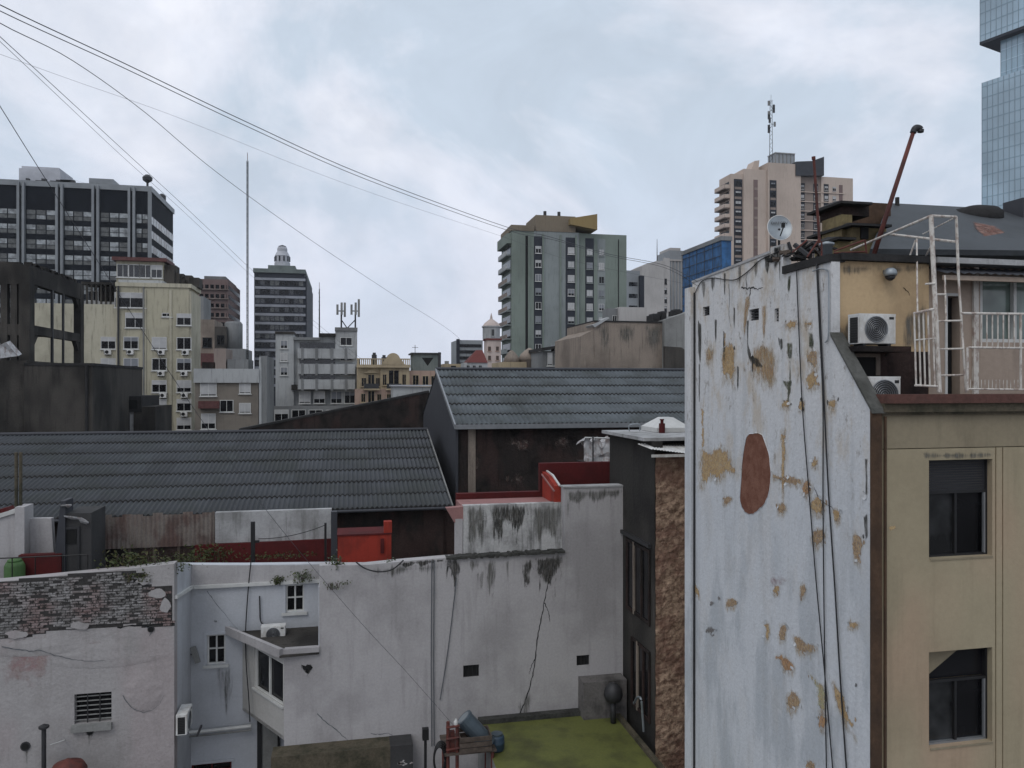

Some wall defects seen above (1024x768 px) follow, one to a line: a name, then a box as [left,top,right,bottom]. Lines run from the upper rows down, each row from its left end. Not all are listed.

peeling [721,334,735,381]
flaking render [700,409,842,523]
leakage [469,506,557,543]
peeling [852,514,867,563]
leakage [524,556,560,589]
flaking render [0,571,175,639]
peeling [762,621,818,670]
peeling [788,692,801,714]
peeling [808,675,856,727]